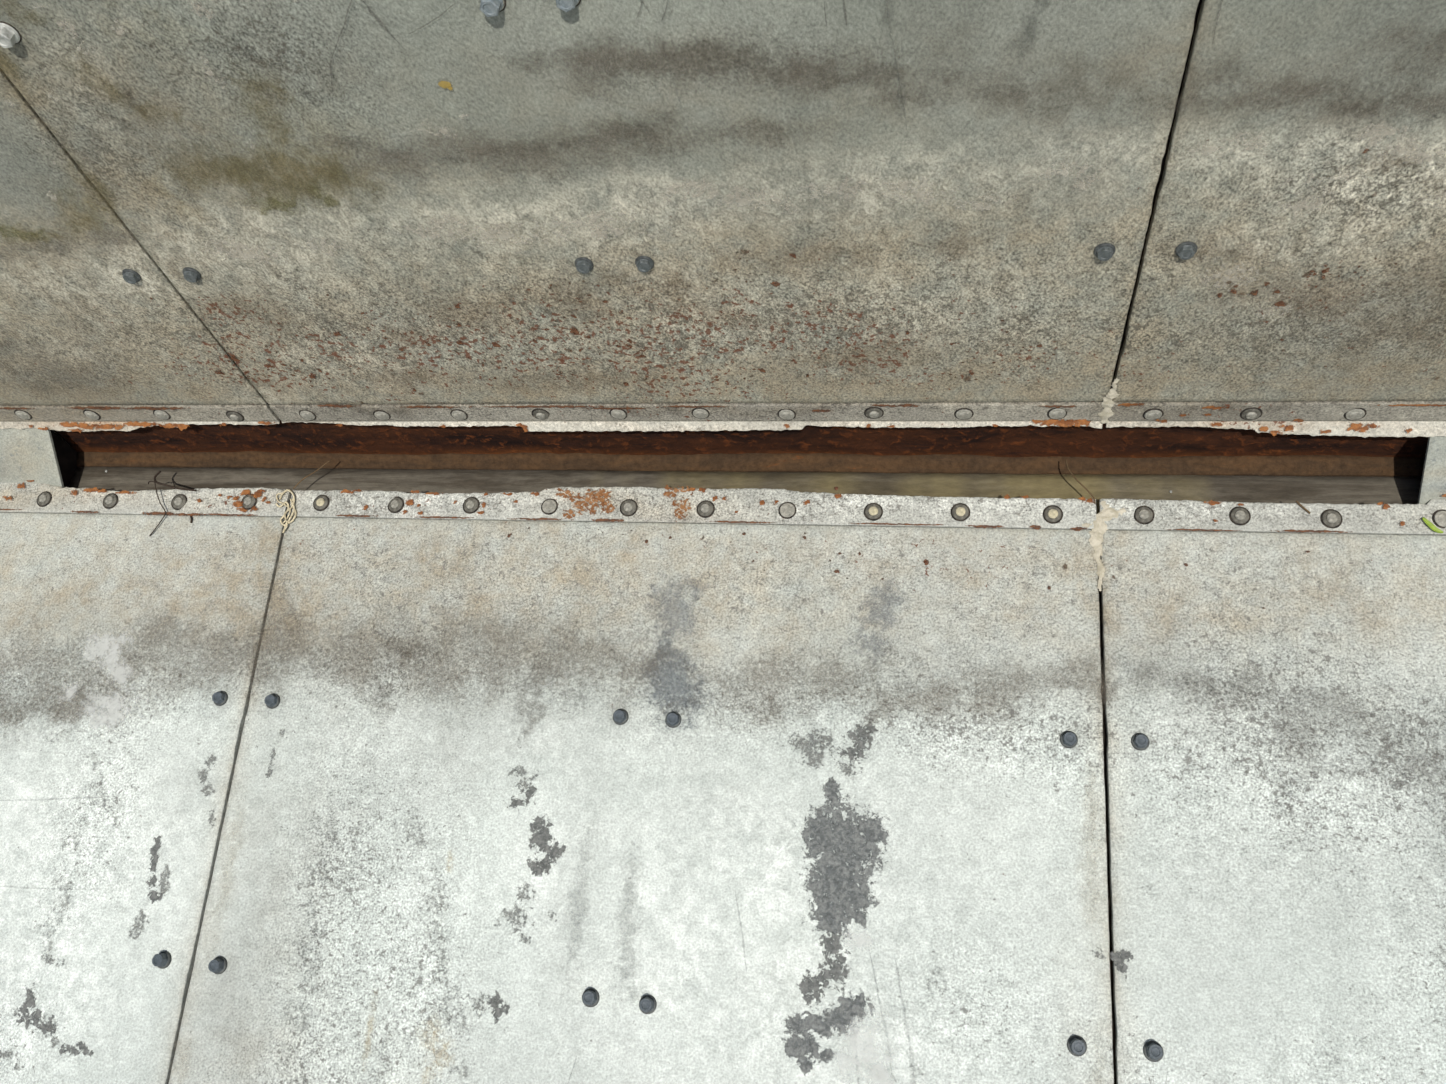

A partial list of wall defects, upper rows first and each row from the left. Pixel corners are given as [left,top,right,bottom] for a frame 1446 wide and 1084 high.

corrosion [1217,281,1286,307]
corrosion [346,269,671,388]
corrosion [395,388,646,432]
corrosion [1032,405,1091,427]
corrosion [1320,422,1380,434]
corrosion [71,487,137,513]
corrosion [142,489,271,516]
corrosion [336,489,378,517]
leakage [85,636,132,731]
leakage [643,635,703,727]
peeling [494,766,566,944]
peeling [781,719,889,1075]